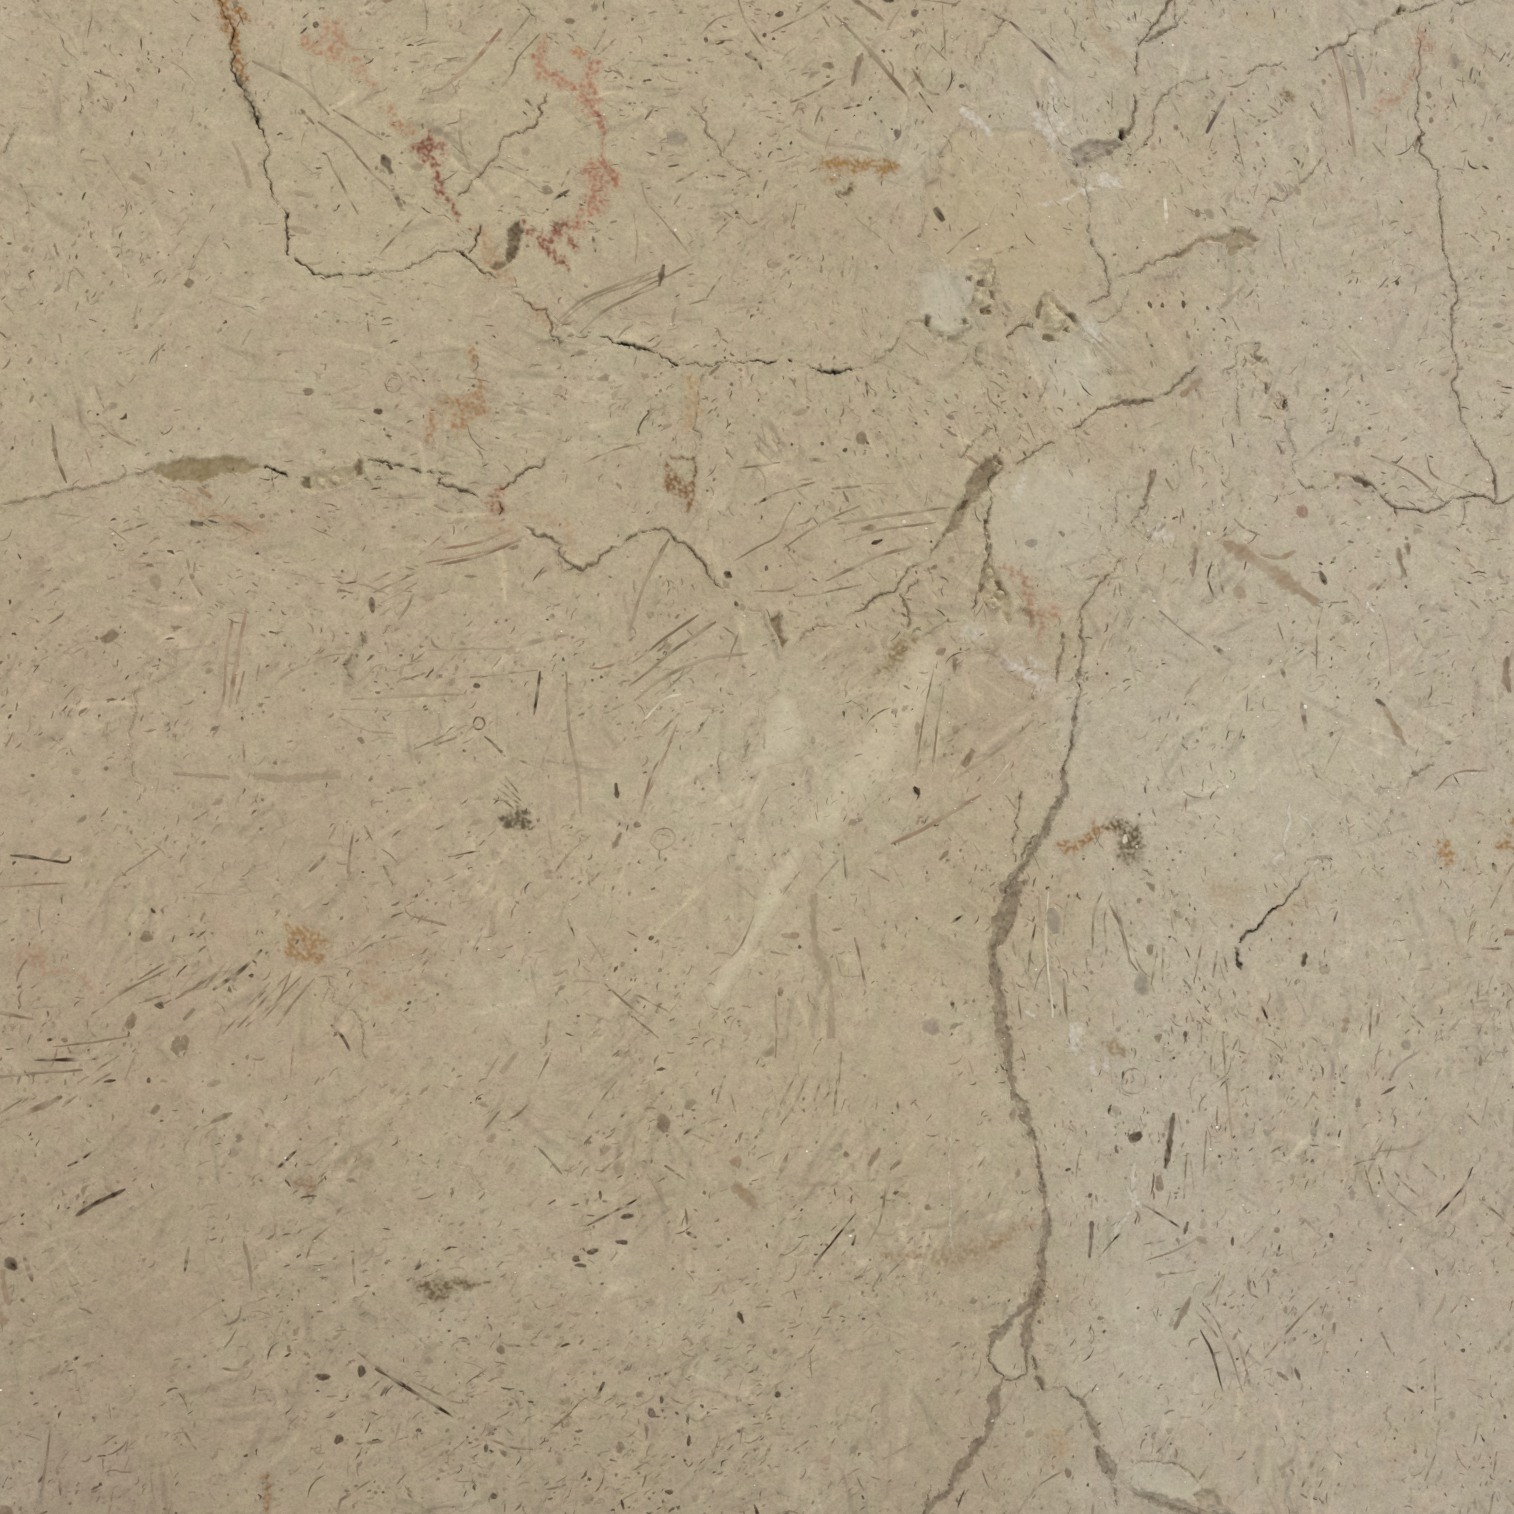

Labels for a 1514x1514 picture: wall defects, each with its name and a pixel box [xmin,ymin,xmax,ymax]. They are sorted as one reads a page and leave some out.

corrosion [520,32,628,275]
crack [217,0,915,489]
crack [362,0,1514,649]
spalling [914,126,1125,348]
crack [0,465,155,508]
spalling [153,454,261,485]
spalling [299,456,367,495]
crack [127,643,182,804]
crack [340,623,392,686]
crack [322,963,371,1106]
crack [920,465,1267,1514]
crack [1233,867,1312,973]